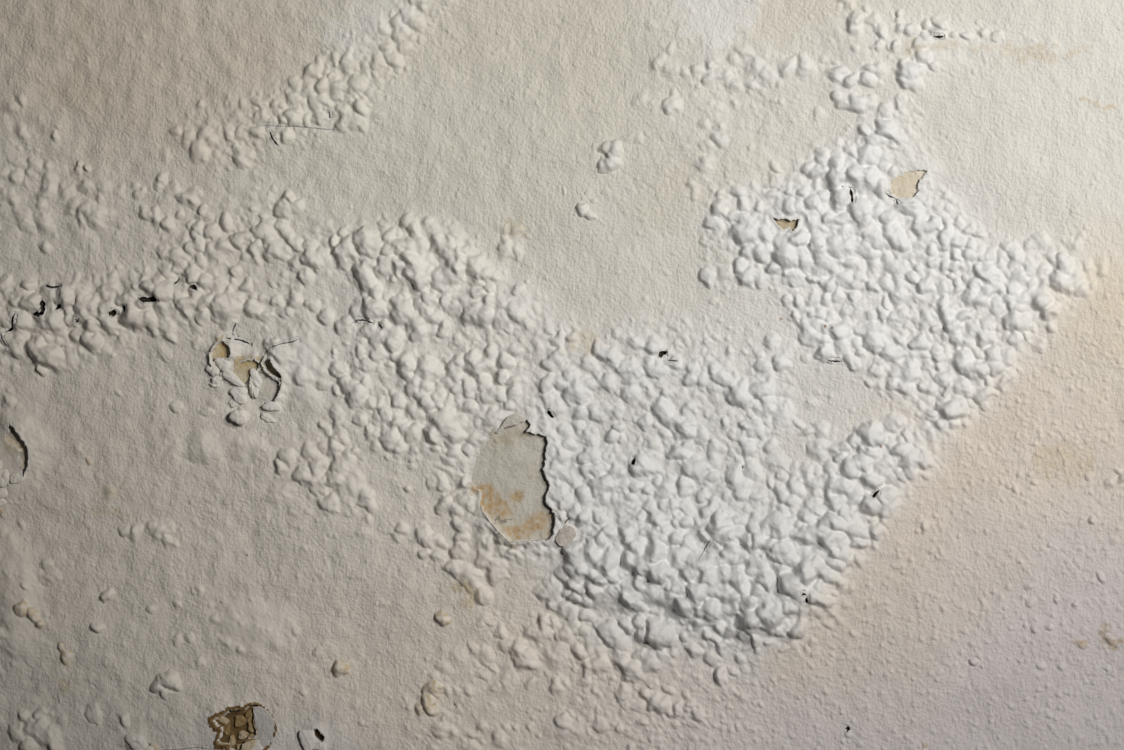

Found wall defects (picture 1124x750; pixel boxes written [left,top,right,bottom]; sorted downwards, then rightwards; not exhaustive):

peeling [769,214,805,235]
peeling [886,166,931,202]
peeling [195,335,287,425]
peeling [0,419,32,514]
peeling [466,413,576,560]
peeling [198,690,277,750]